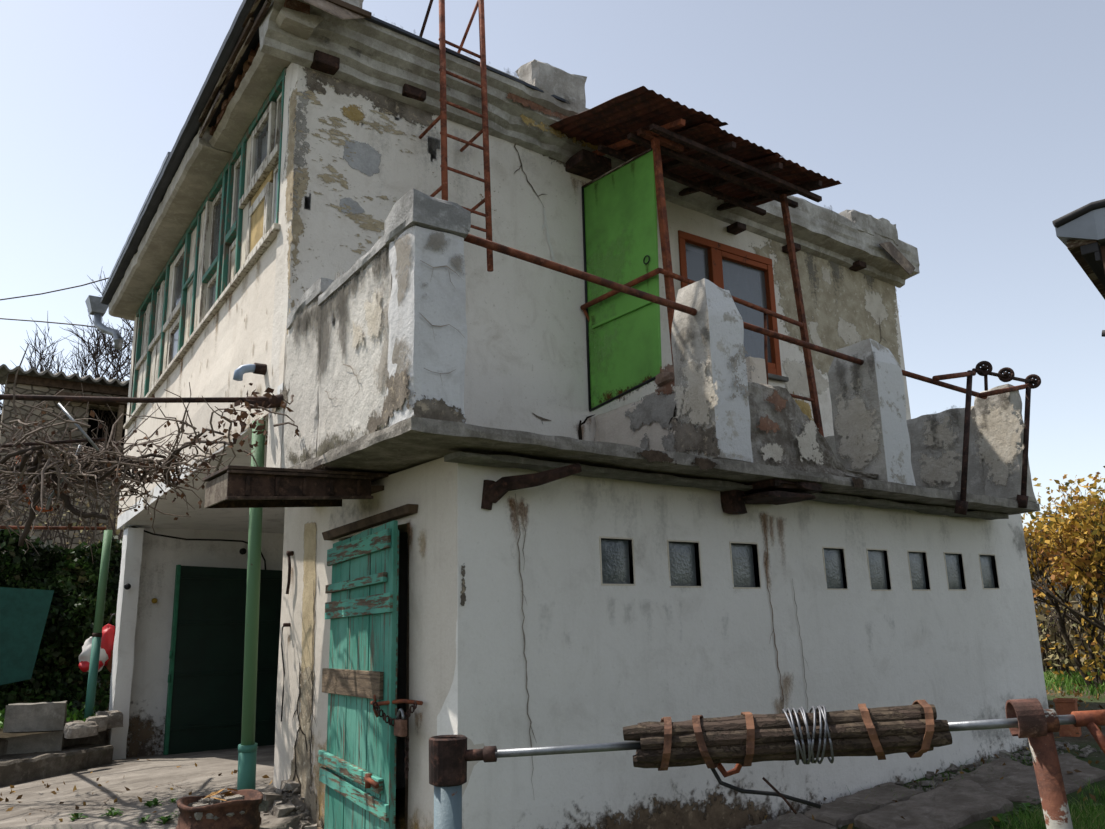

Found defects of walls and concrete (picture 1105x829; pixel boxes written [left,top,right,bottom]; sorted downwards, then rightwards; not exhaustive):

flaking render [282,67,436,314]
crack [514,144,545,207]
water stain [292,246,389,380]
flaking render [366,226,466,433]
flaking render [625,364,720,470]
peeling [729,238,901,463]
peeling [918,443,962,489]
peeling [974,399,1024,486]
crack [290,592,316,791]
flaking render [288,522,323,828]
crack [515,494,537,794]
crack [764,513,808,710]